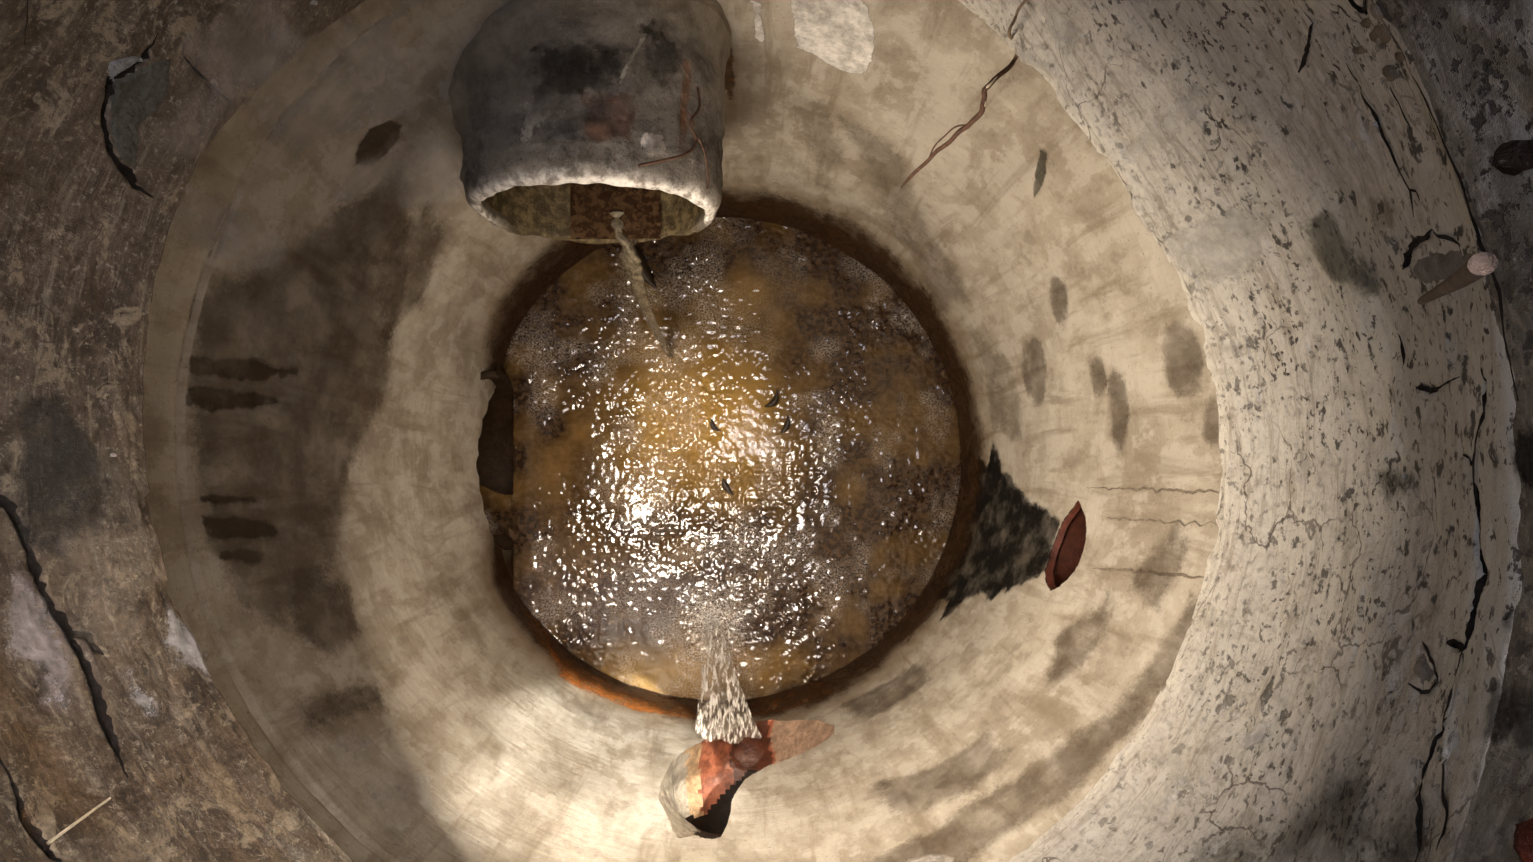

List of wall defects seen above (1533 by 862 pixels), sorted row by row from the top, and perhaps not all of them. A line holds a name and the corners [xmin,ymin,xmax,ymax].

leakage [532,21,678,95]
crack [1298,11,1313,73]
crack [100,33,231,198]
leakage [641,132,663,149]
leakage [487,190,1059,722]
crack [1346,0,1519,862]
crack [0,494,129,778]
leakage [1054,630,1070,676]
leakage [1183,605,1195,626]
crack [0,757,62,862]
leakage [886,825,976,862]
leakage [880,769,998,804]